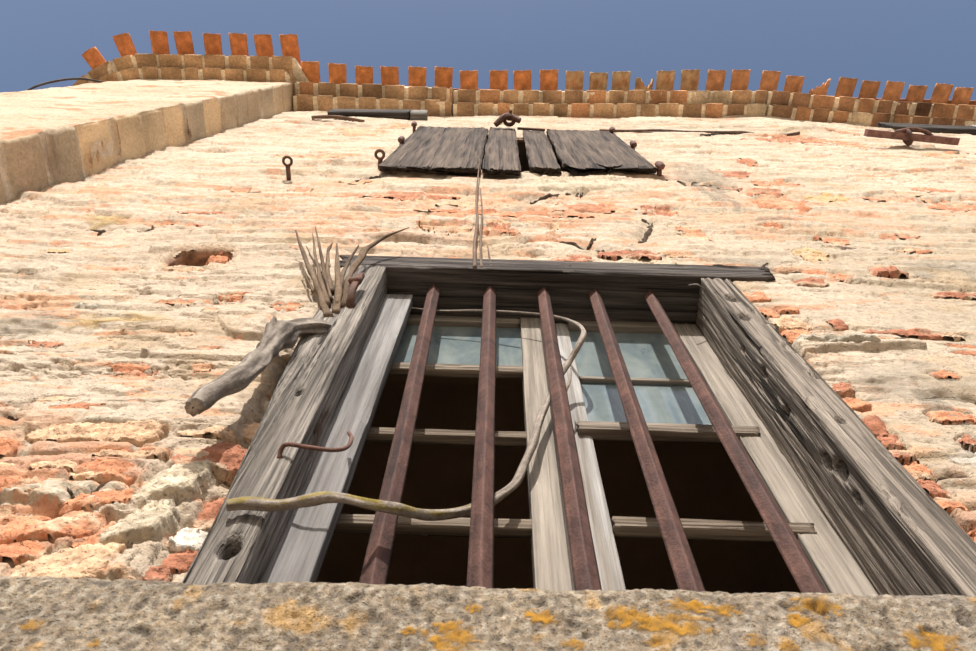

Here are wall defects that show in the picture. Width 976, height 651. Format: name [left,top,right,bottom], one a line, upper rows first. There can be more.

flaking render [157,250,231,273]
spalling [929,369,960,381]
spalling [31,395,107,410]
spalling [832,382,976,513]
spalling [0,420,260,582]